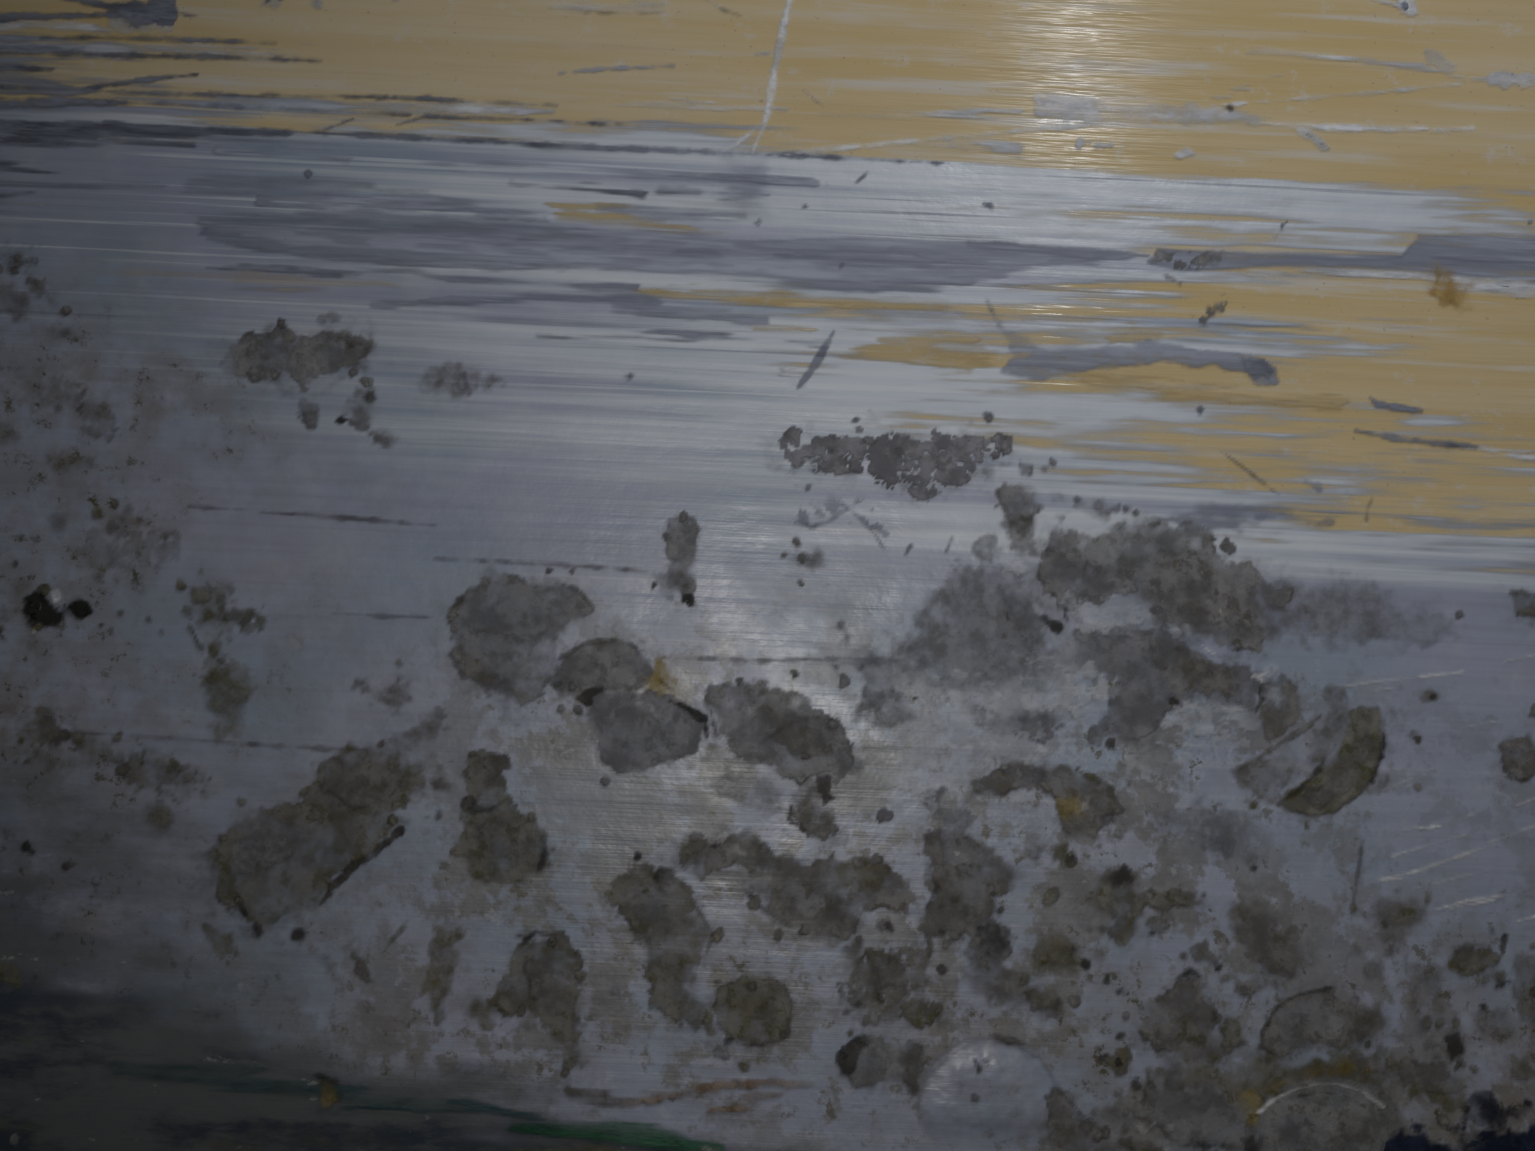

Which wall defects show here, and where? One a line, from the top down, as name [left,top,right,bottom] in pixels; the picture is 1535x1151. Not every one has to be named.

spalling [108,0,178,27]
peeling [0,35,141,82]
peeling [0,96,364,129]
peeling [1384,415,1474,435]
peeling [1289,466,1380,486]
peeling [1069,562,1108,593]
peeling [1250,586,1265,606]
peeling [965,863,992,898]
spalling [1388,905,1415,923]
leakage [1232,905,1297,974]
spalling [1449,946,1500,975]
leakage [449,1100,538,1119]